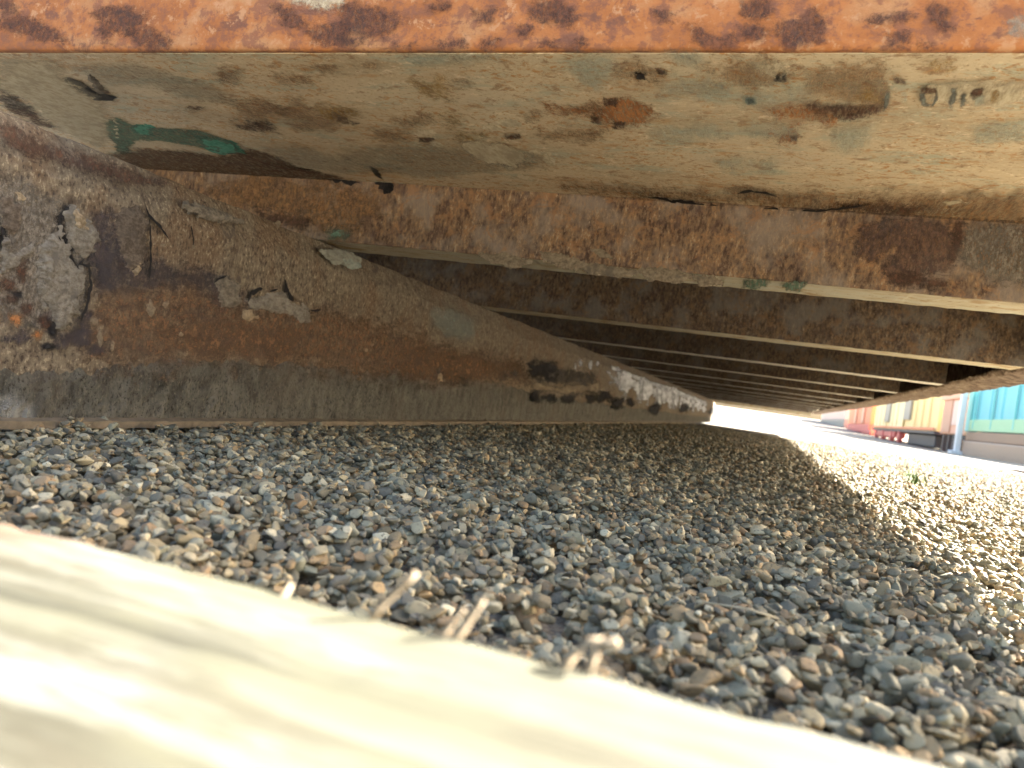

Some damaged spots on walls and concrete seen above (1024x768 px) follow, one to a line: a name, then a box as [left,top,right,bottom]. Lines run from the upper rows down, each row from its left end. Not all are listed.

rust [90,5,170,51]
rust [270,1,411,49]
rust [517,0,576,48]
rust [690,0,825,49]
rust [864,13,915,49]
rust [528,96,661,143]
peeling [0,191,115,355]
rust [84,208,220,306]
peeling [319,229,362,270]
rust [561,184,1024,291]
peeling [214,275,320,324]
leakage [575,360,707,413]